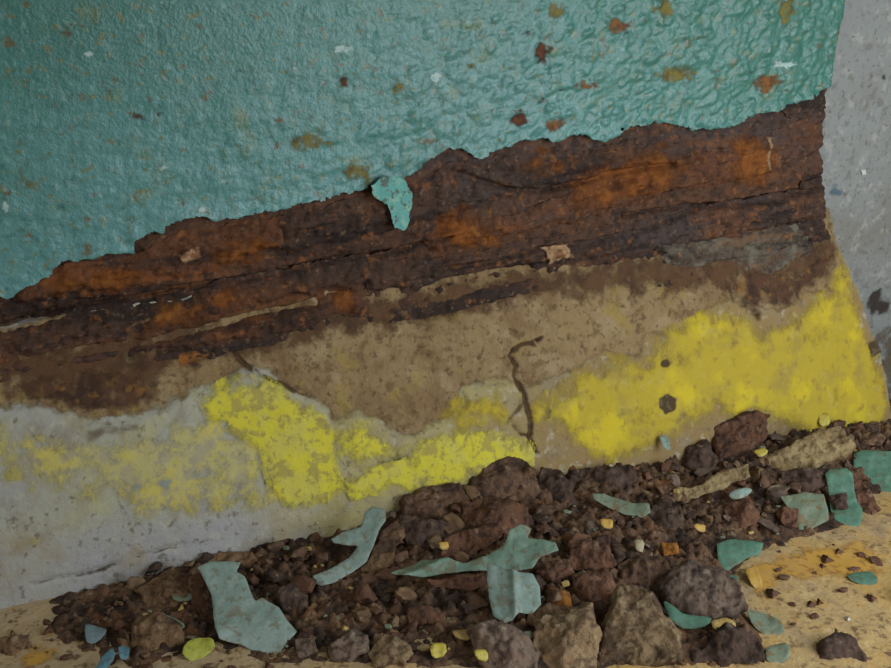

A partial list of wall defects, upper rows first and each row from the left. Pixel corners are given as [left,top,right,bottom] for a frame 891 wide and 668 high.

corrosion [0,89,836,409]
spalling [0,209,887,517]
crack [509,336,543,454]
peeling [600,518,613,530]
peeling [633,539,644,552]
peeling [746,541,884,593]
peeling [780,468,863,530]